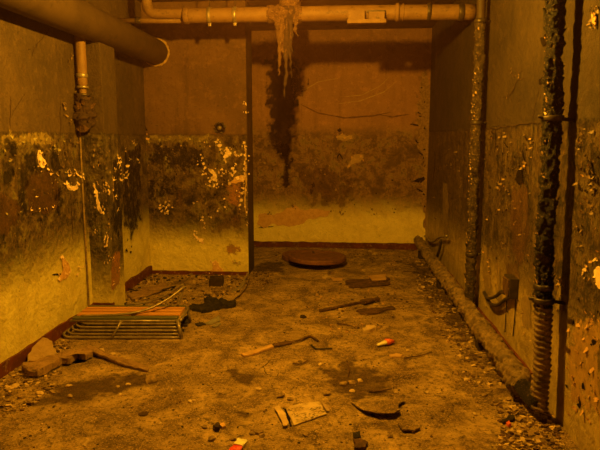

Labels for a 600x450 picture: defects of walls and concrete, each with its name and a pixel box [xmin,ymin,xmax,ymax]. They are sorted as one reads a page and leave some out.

leakage [1,129,61,213]
peeling [24,141,85,221]
peeling [93,148,140,247]
leakage [123,133,211,253]
peeling [193,122,250,244]
peeling [257,204,346,228]
peeling [576,250,600,289]
spalling [565,310,600,424]